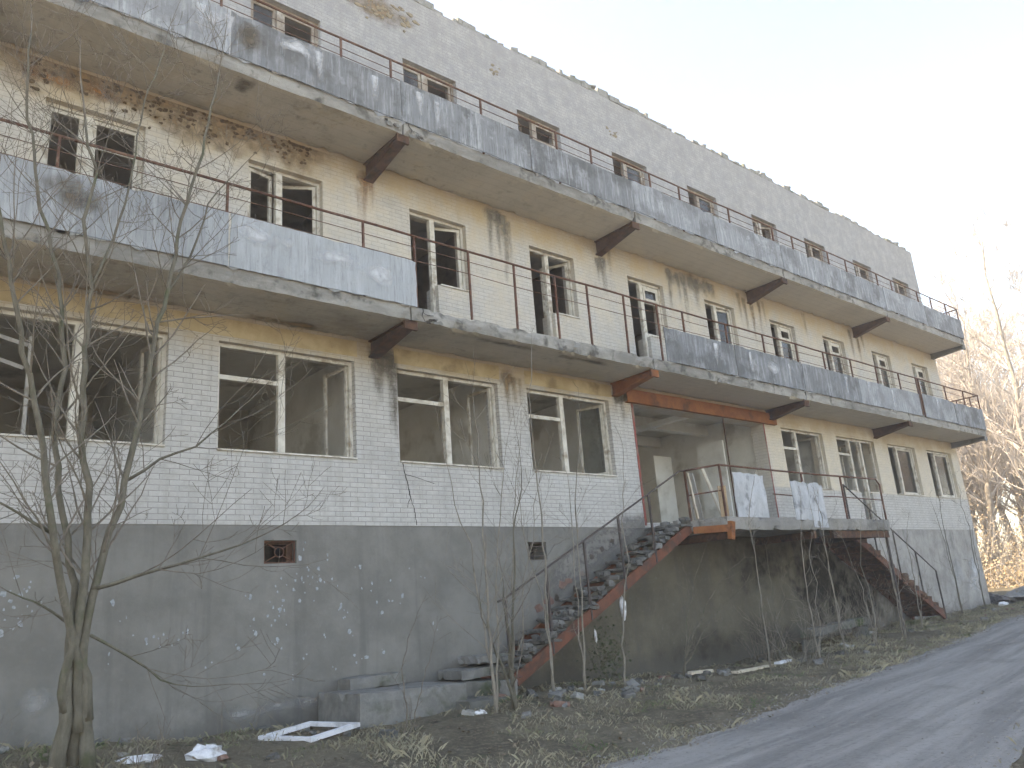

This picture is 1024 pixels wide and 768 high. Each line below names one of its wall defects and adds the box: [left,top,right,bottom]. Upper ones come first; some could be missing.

spalling [354,0,420,33]